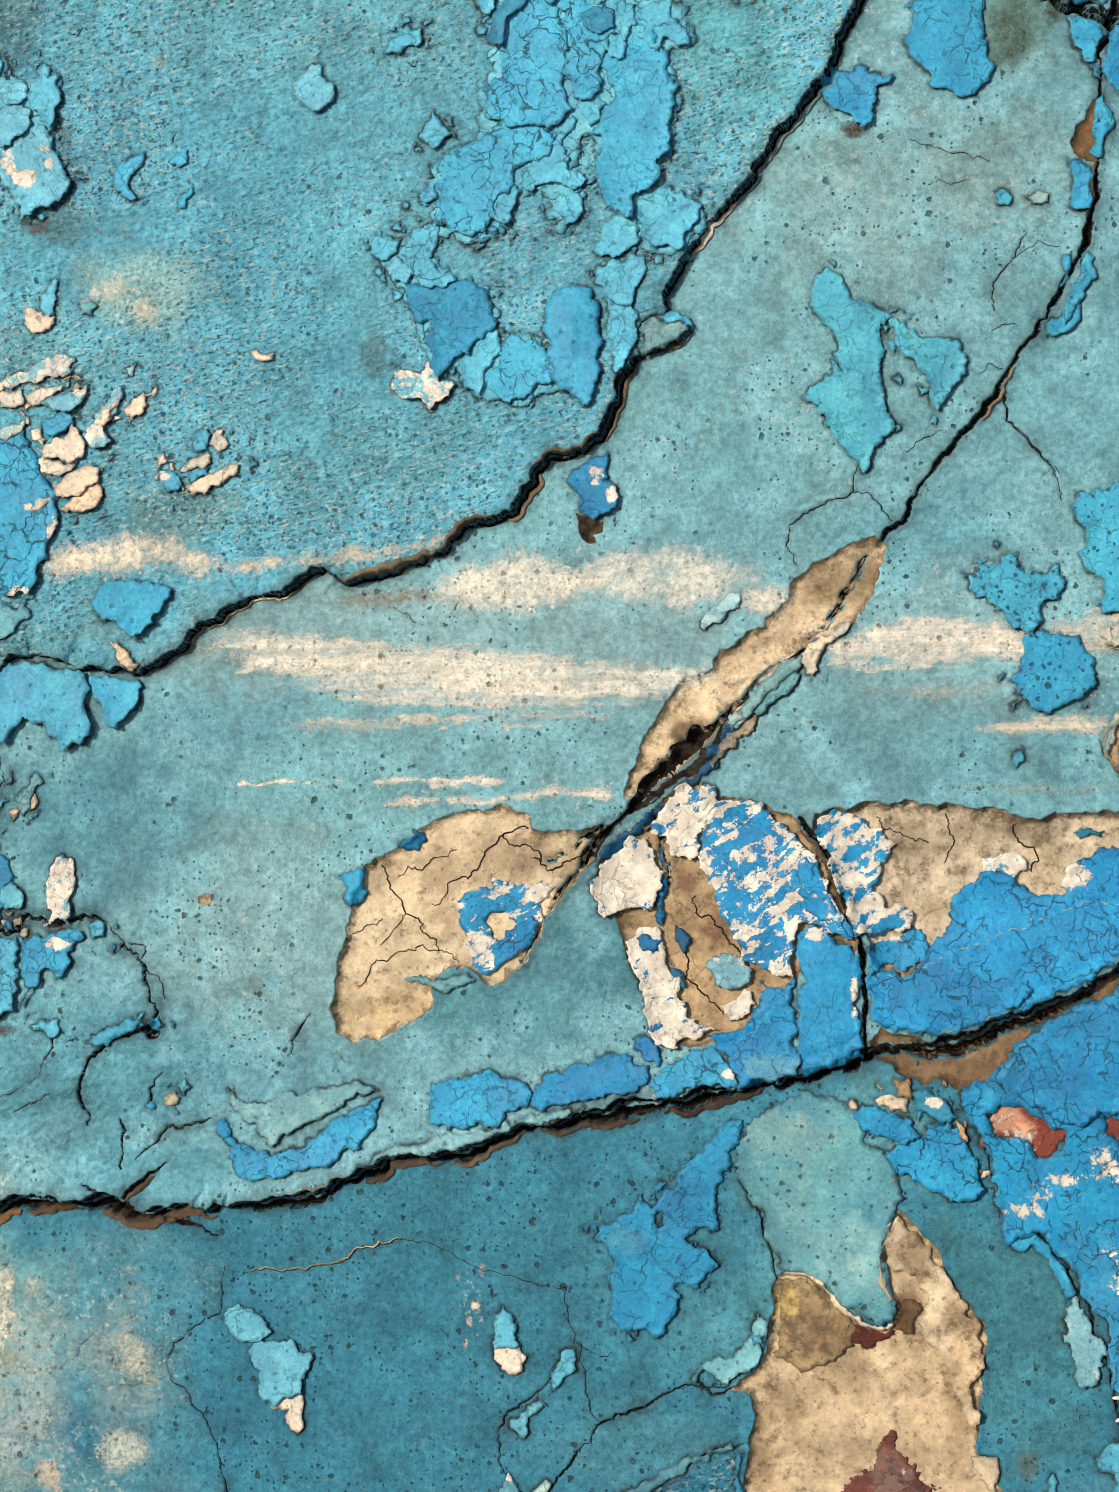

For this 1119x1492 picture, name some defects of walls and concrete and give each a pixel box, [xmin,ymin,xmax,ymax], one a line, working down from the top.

crack [1040,0,1119,98]
peeling [0,51,86,220]
peeling [113,152,145,201]
peeling [363,0,707,410]
crack [910,139,989,185]
peeling [22,279,58,333]
crack [0,0,865,677]
peeling [153,429,258,511]
crack [523,156,1100,959]
flaking render [216,535,1119,1492]
crack [0,817,1119,1492]